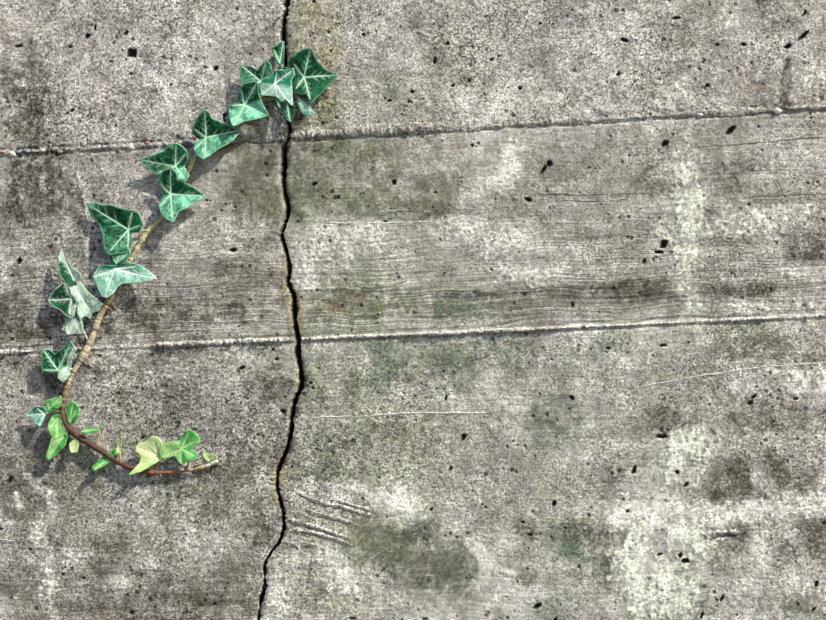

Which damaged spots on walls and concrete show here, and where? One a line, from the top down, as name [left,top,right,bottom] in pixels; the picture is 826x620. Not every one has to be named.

crack [275,0,291,67]
crack [137,118,487,620]